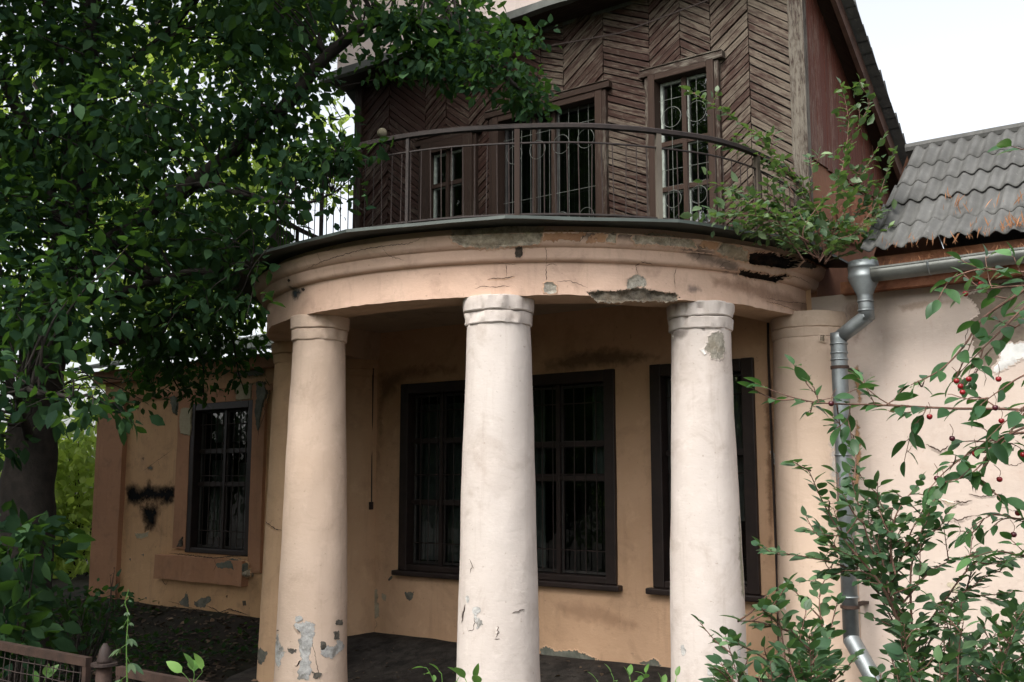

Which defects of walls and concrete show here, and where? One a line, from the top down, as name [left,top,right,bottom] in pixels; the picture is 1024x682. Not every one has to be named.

crack [475,263,515,289]
spalling [449,226,821,304]
peeling [699,329,726,362]
peeling [964,277,1024,385]
peeling [461,596,483,631]
peeling [257,616,345,680]